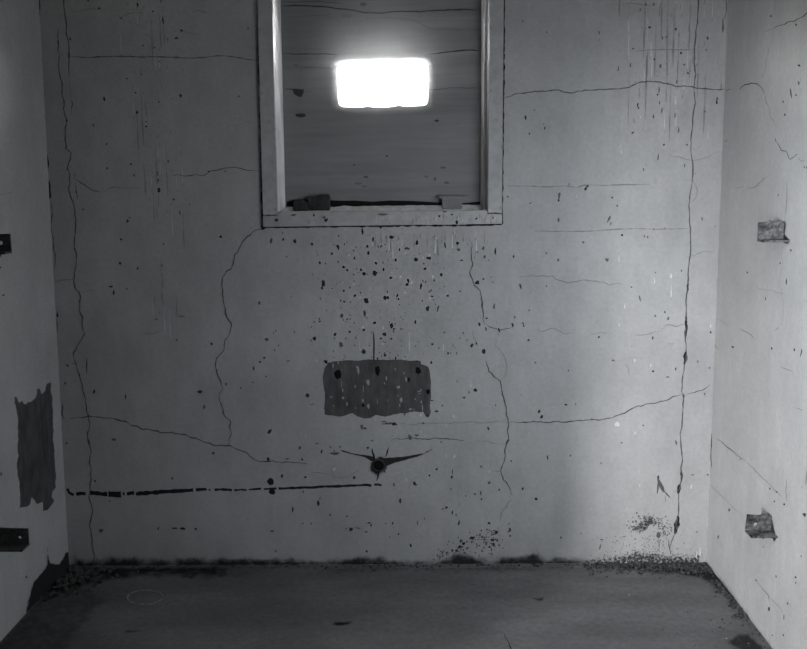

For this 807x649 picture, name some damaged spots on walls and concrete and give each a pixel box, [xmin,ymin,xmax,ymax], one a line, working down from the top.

crack [47,0,358,561]
crack [392,0,807,554]